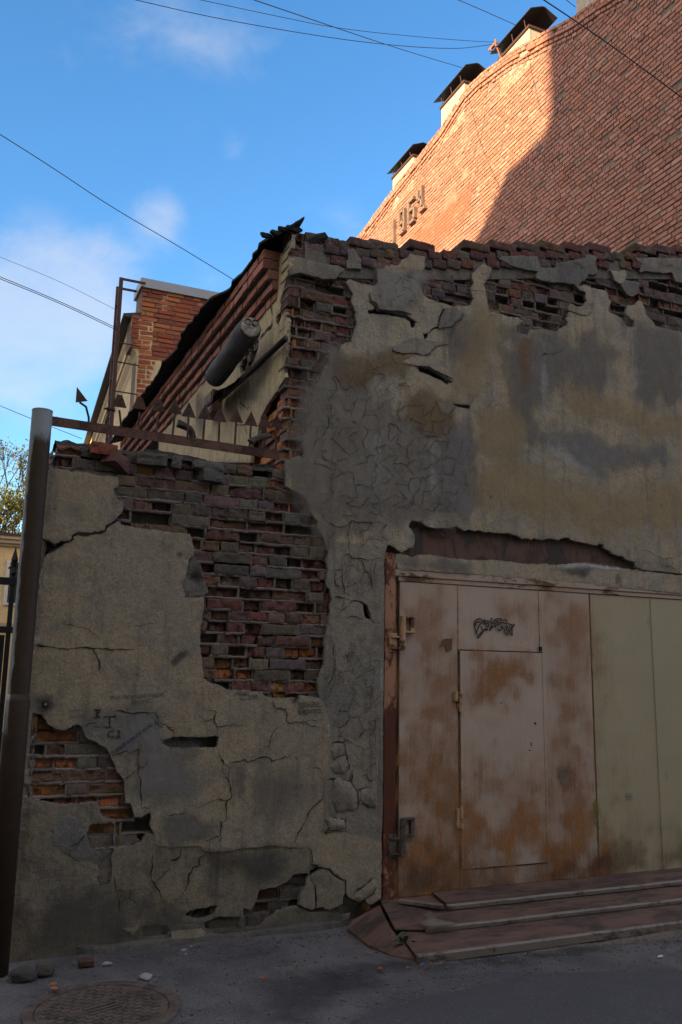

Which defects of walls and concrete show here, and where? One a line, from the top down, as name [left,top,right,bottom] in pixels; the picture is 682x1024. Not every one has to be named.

spalling [54,231,412,699]
spalling [420,263,682,335]
damp [501,327,666,474]
damp [635,322,681,406]
crack [42,518,121,554]
crack [84,268,467,915]
spalling [24,717,152,851]
spalling [186,869,315,929]